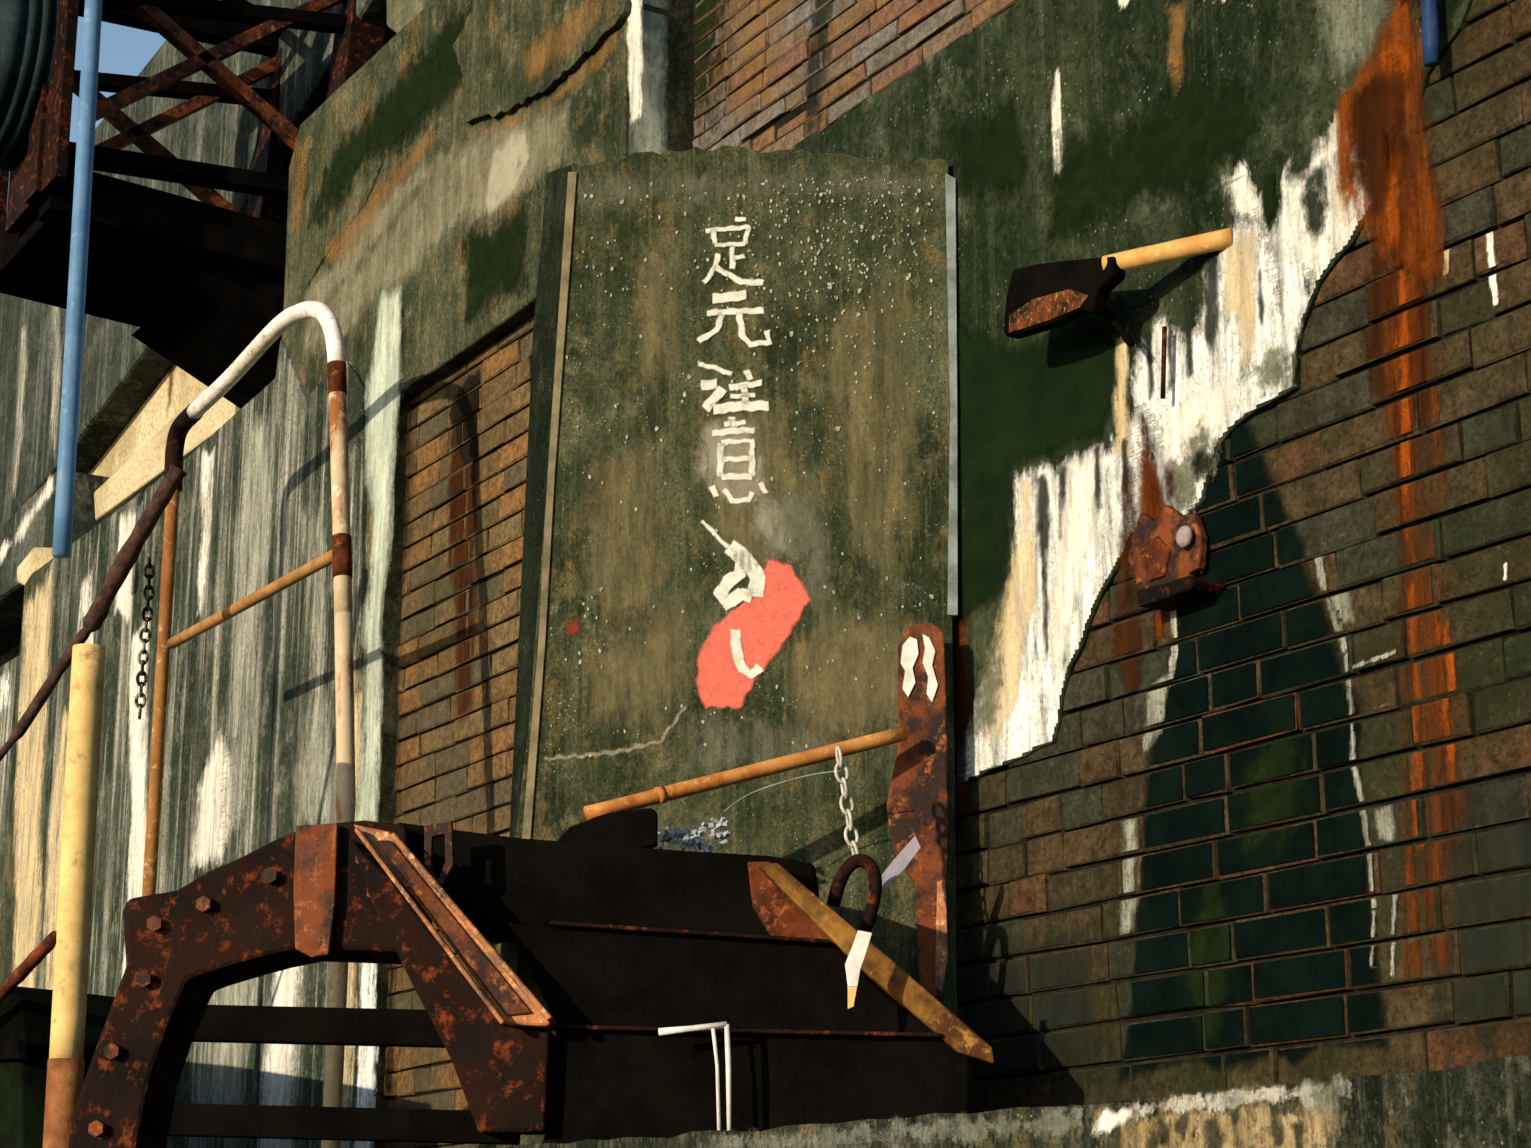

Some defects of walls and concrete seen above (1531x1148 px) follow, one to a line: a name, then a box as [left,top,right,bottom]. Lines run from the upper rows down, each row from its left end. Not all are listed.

peeling [305,33,616,351]
leakage [1052,70,1063,174]
leakage [0,570,69,990]
leakage [115,563,149,901]
leakage [191,414,275,868]
leakage [354,292,401,822]
peeling [1141,536,1171,581]
leakage [956,117,1365,783]
corrosion [1336,0,1462,991]
leakage [209,966,303,1007]
leakage [342,1046,378,1108]
leakage [346,962,377,1008]